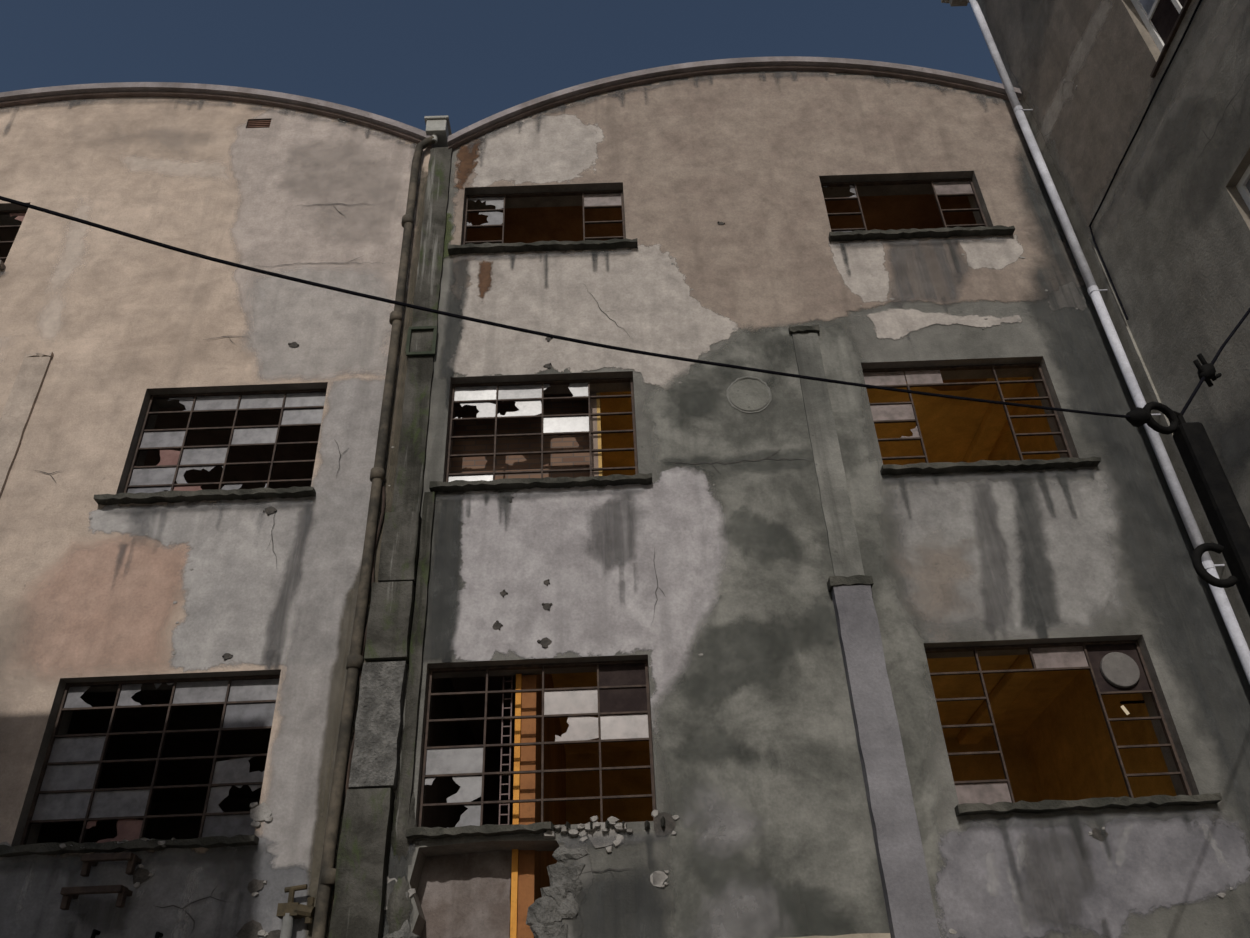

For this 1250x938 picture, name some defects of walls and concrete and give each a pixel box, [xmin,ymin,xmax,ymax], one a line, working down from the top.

corrosion [478,261,492,298]
water stain [729,451,813,471]
flaking render [450,0,1250,938]
flaking render [0,109,421,938]
water stain [592,489,634,568]
water stain [263,502,311,670]
water stain [687,620,794,701]
water stain [698,848,854,938]